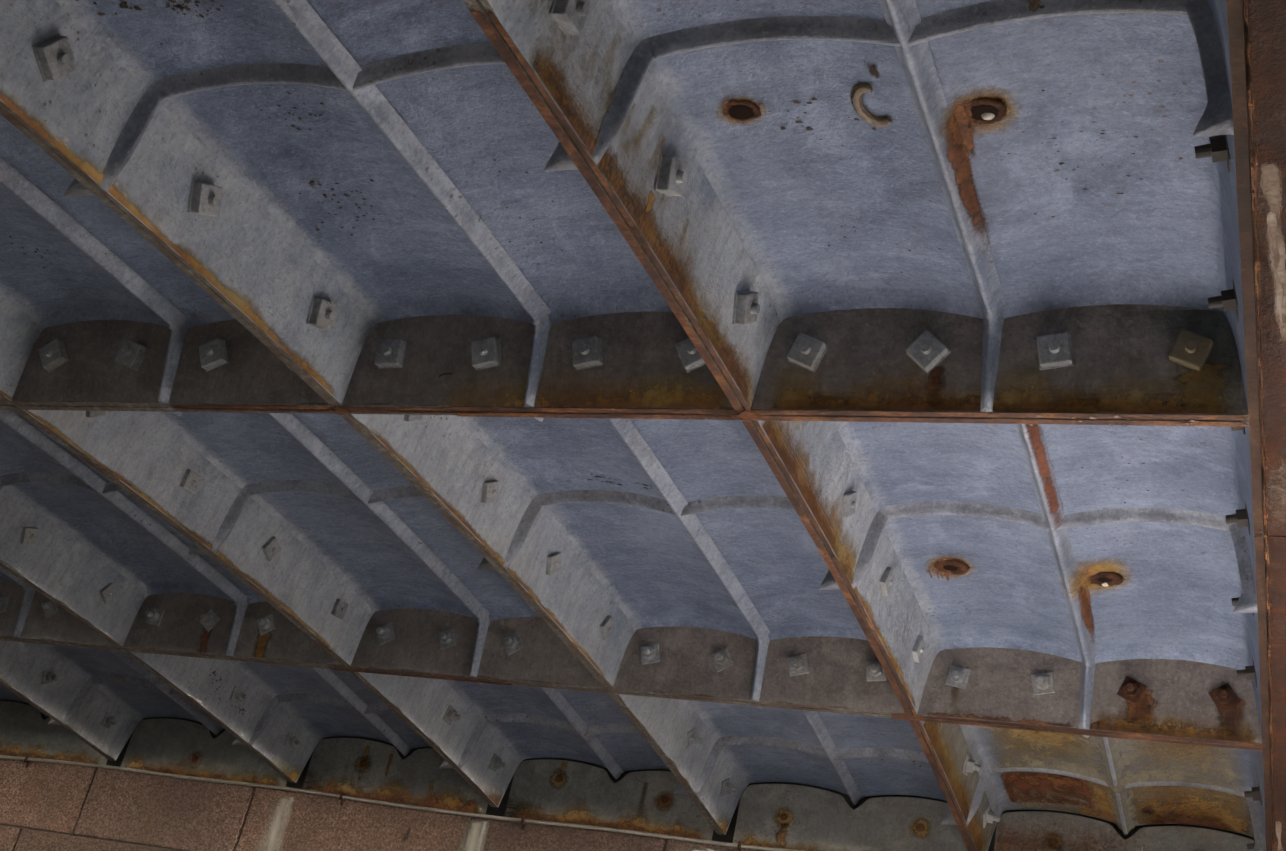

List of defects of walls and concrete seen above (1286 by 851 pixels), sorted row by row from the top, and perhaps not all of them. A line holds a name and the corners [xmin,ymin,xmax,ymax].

rust [166,0,223,18]
rust [451,52,1231,851]
rust [1254,249,1272,685]
rust [1090,689,1274,786]
damp [268,797,293,851]
rust [1133,787,1252,835]